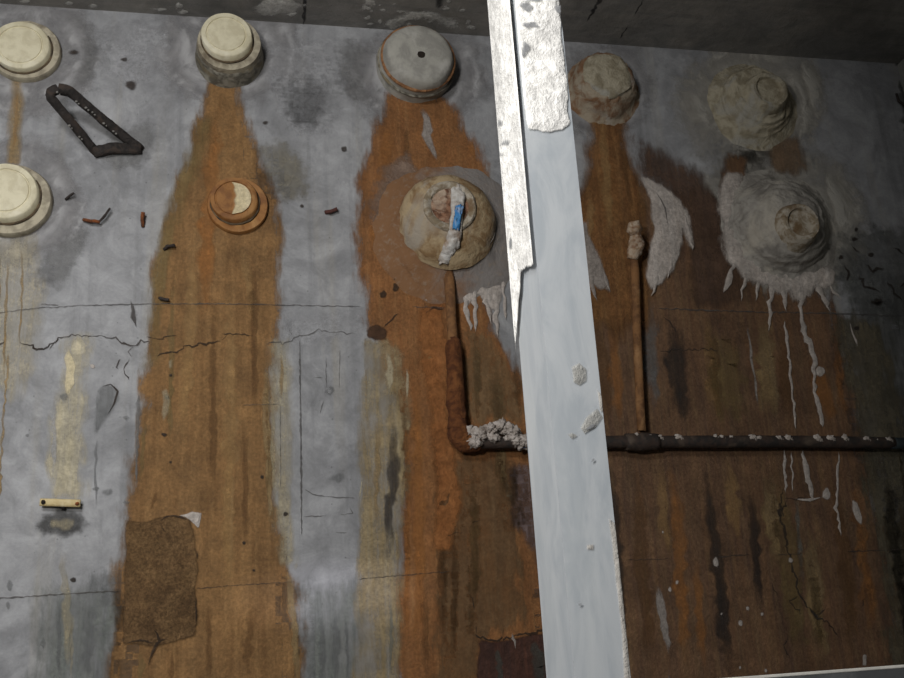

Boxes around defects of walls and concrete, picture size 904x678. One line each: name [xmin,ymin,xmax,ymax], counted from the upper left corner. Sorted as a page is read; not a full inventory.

rust [8,81,22,164]
crack [0,328,350,379]
rust [105,82,306,678]
rust [353,25,543,678]
leakage [463,281,507,335]
leakage [641,177,694,296]
rust [580,122,904,438]
leakage [718,173,849,442]
spalling [123,512,201,664]
rust [607,448,904,678]
leakage [783,451,841,533]
leakage [852,501,862,524]